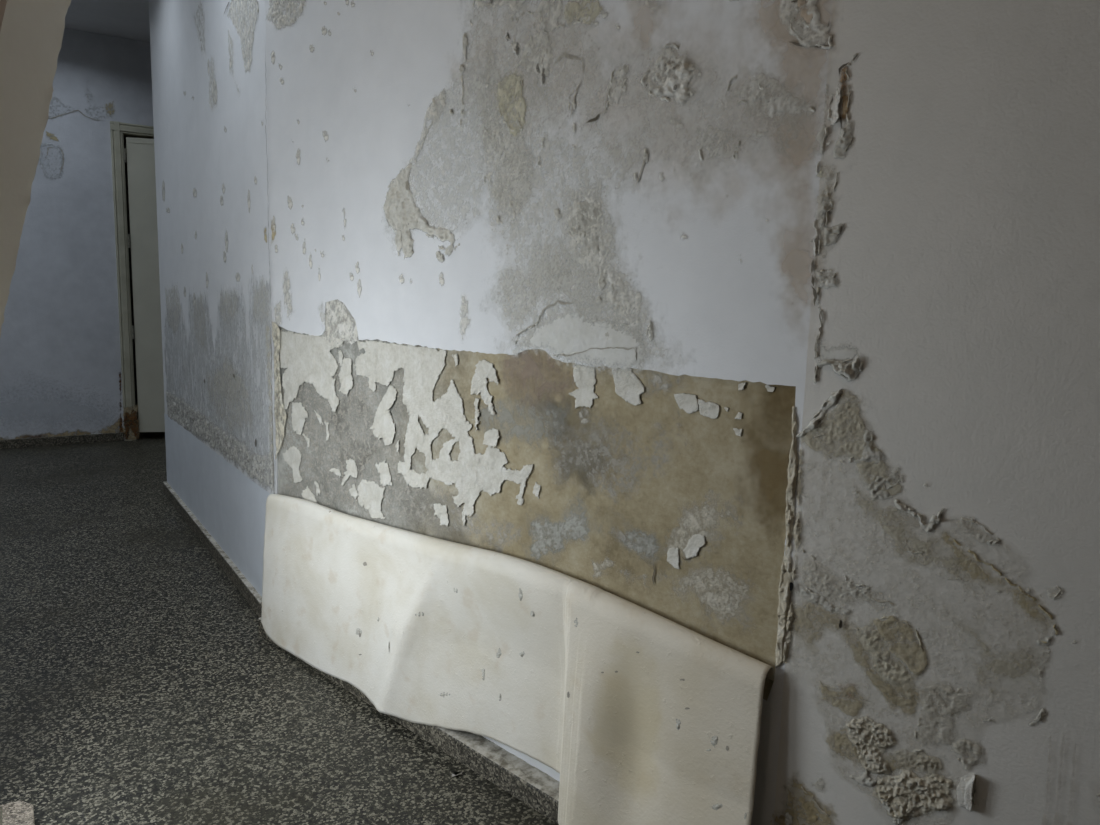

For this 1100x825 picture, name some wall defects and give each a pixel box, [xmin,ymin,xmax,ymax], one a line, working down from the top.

flaking render [780,0,833,49]
damp [478,85,653,346]
damp [165,272,292,482]
spalling [275,300,1059,825]
damp [664,491,749,623]